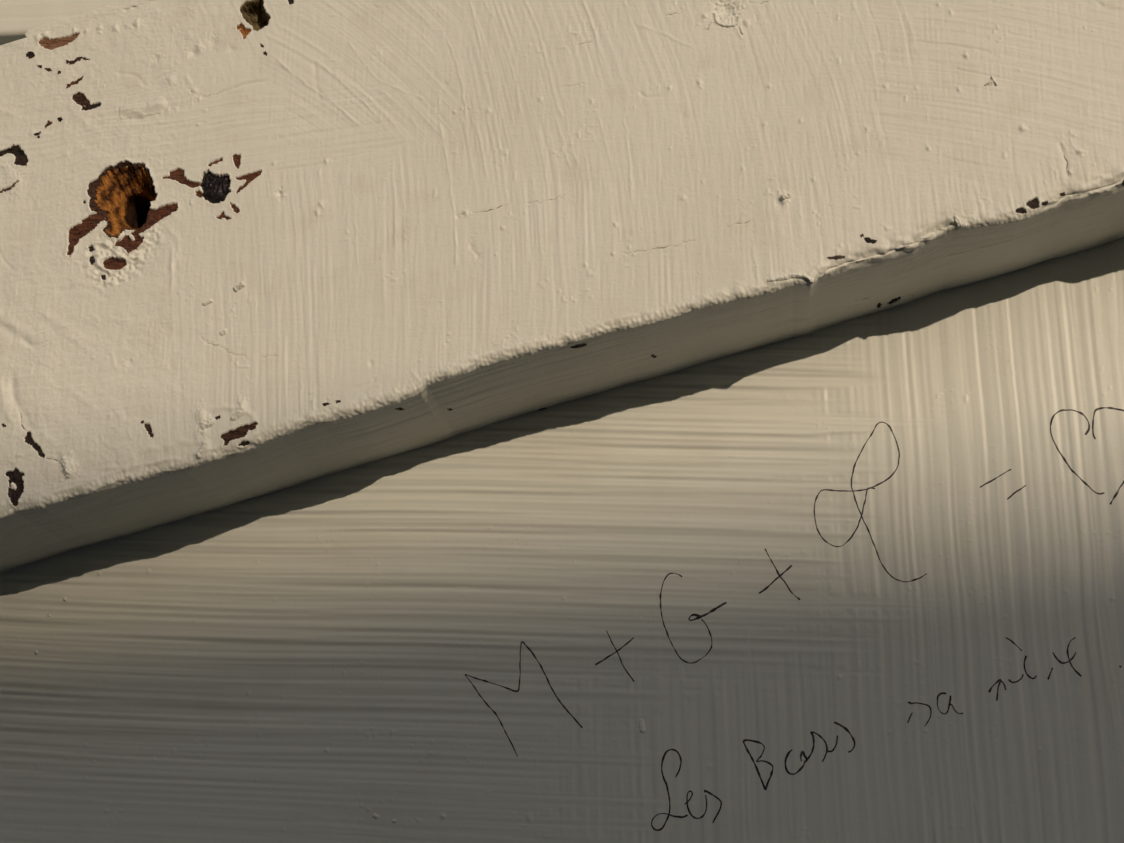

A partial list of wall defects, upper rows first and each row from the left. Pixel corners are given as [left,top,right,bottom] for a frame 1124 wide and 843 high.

peeling [26,33,101,111]
peeling [0,145,28,166]
peeling [163,169,203,198]
peeling [208,154,262,220]
peeling [88,234,144,280]
peeling [221,422,257,446]
peeling [5,468,25,506]